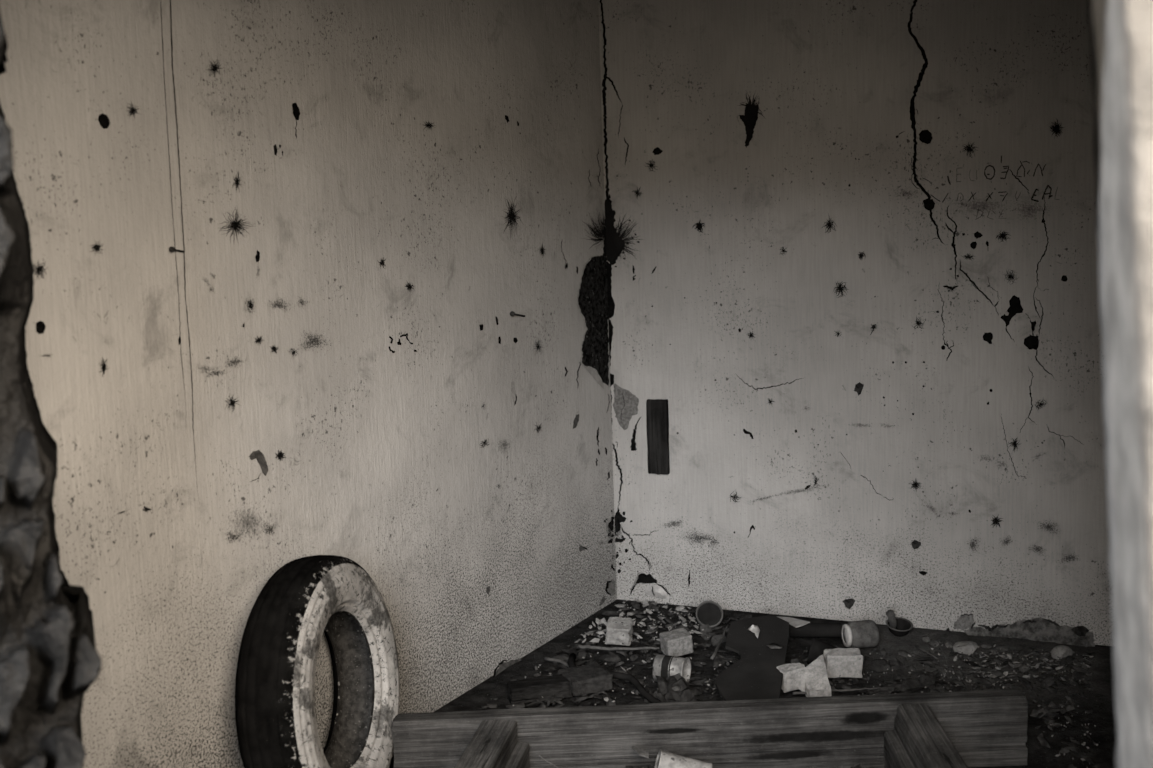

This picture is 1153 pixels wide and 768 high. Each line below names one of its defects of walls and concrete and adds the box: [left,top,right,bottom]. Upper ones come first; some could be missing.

flaking render [565,255,639,430]
crack [595,395,658,569]
crack [907,0,999,359]
crack [1001,169,1084,478]